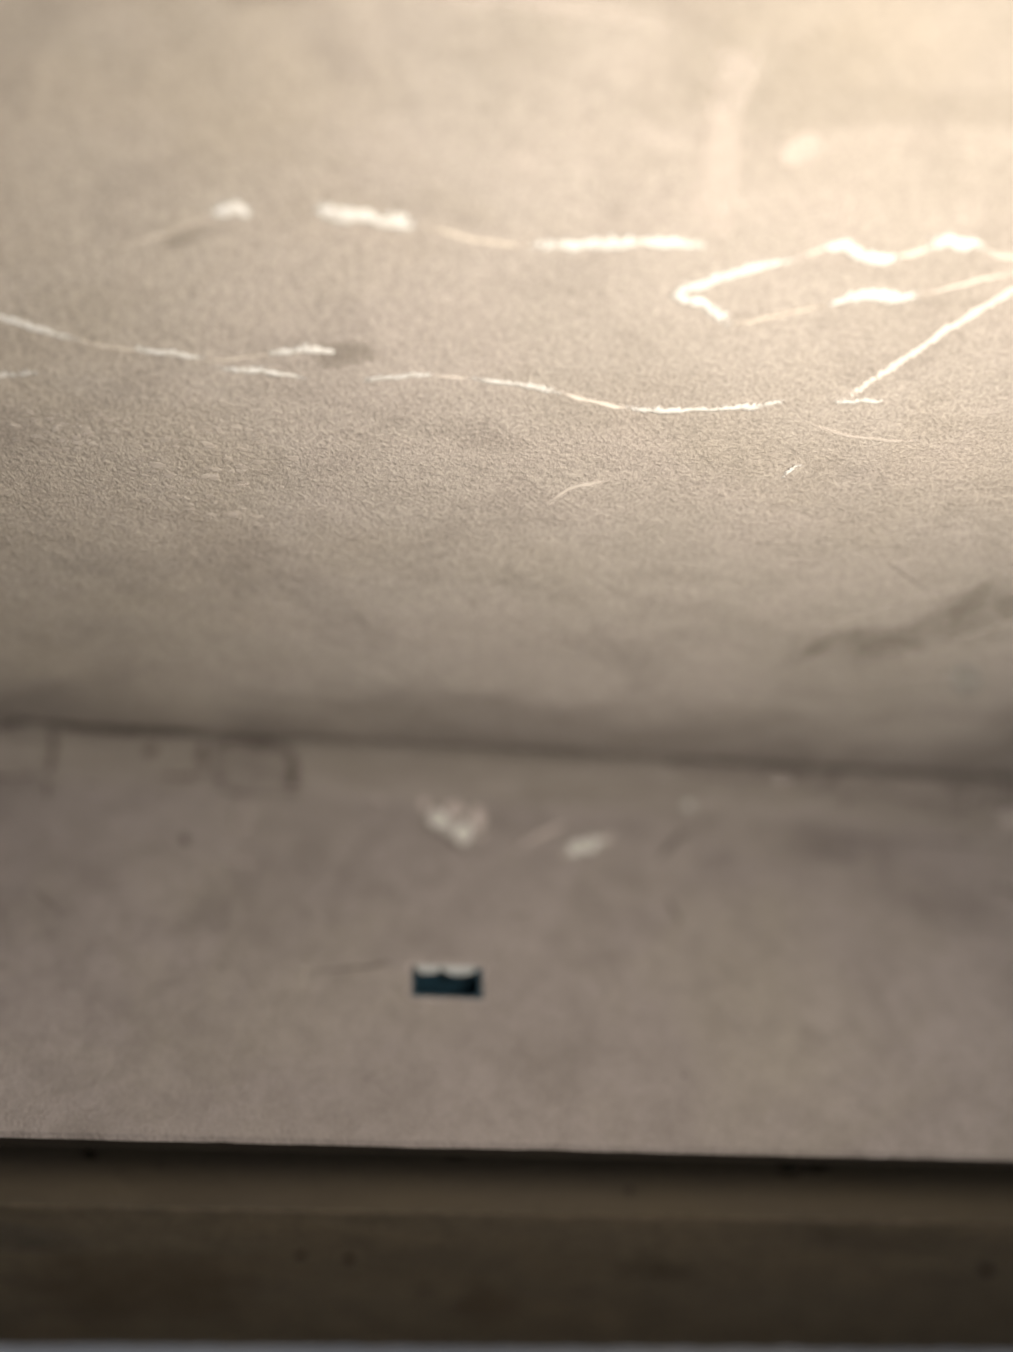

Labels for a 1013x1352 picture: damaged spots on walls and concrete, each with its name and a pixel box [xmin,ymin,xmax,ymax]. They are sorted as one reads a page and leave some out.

crack [119,199,252,248]
crack [315,199,1013,404]
crack [0,315,336,379]
crack [365,372,782,415]